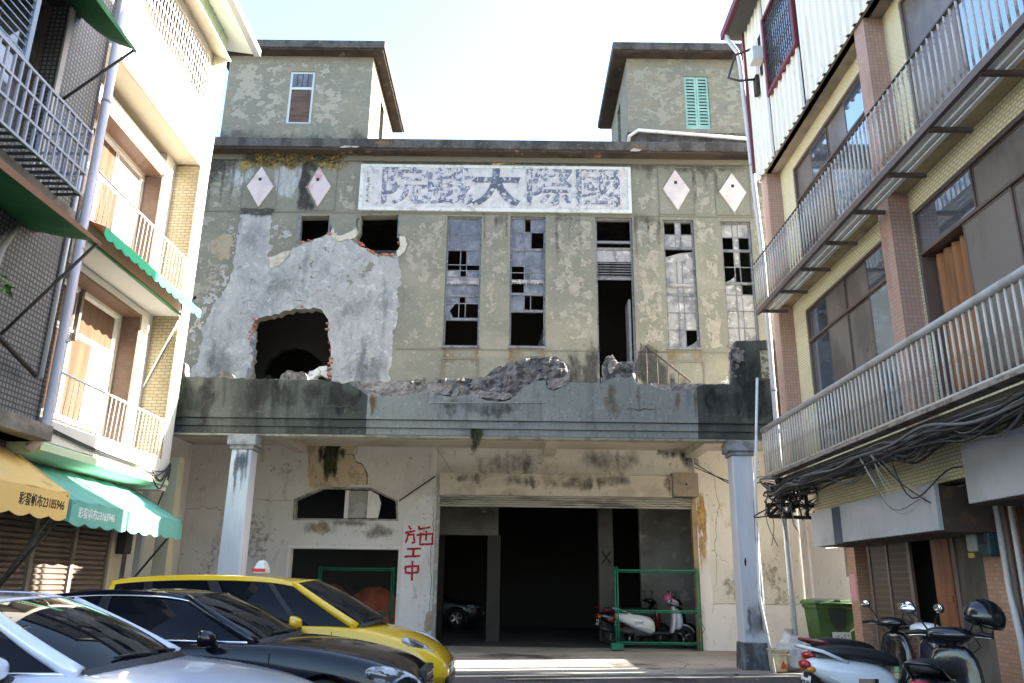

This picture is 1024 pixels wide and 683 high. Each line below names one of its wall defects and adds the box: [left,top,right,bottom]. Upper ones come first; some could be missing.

flaking render [189,171,570,401]
spalling [602,355,636,384]
water stain [177,378,217,411]
water stain [330,382,360,413]
water stain [233,449,249,488]
water stain [318,446,345,478]
flaking render [307,446,369,489]